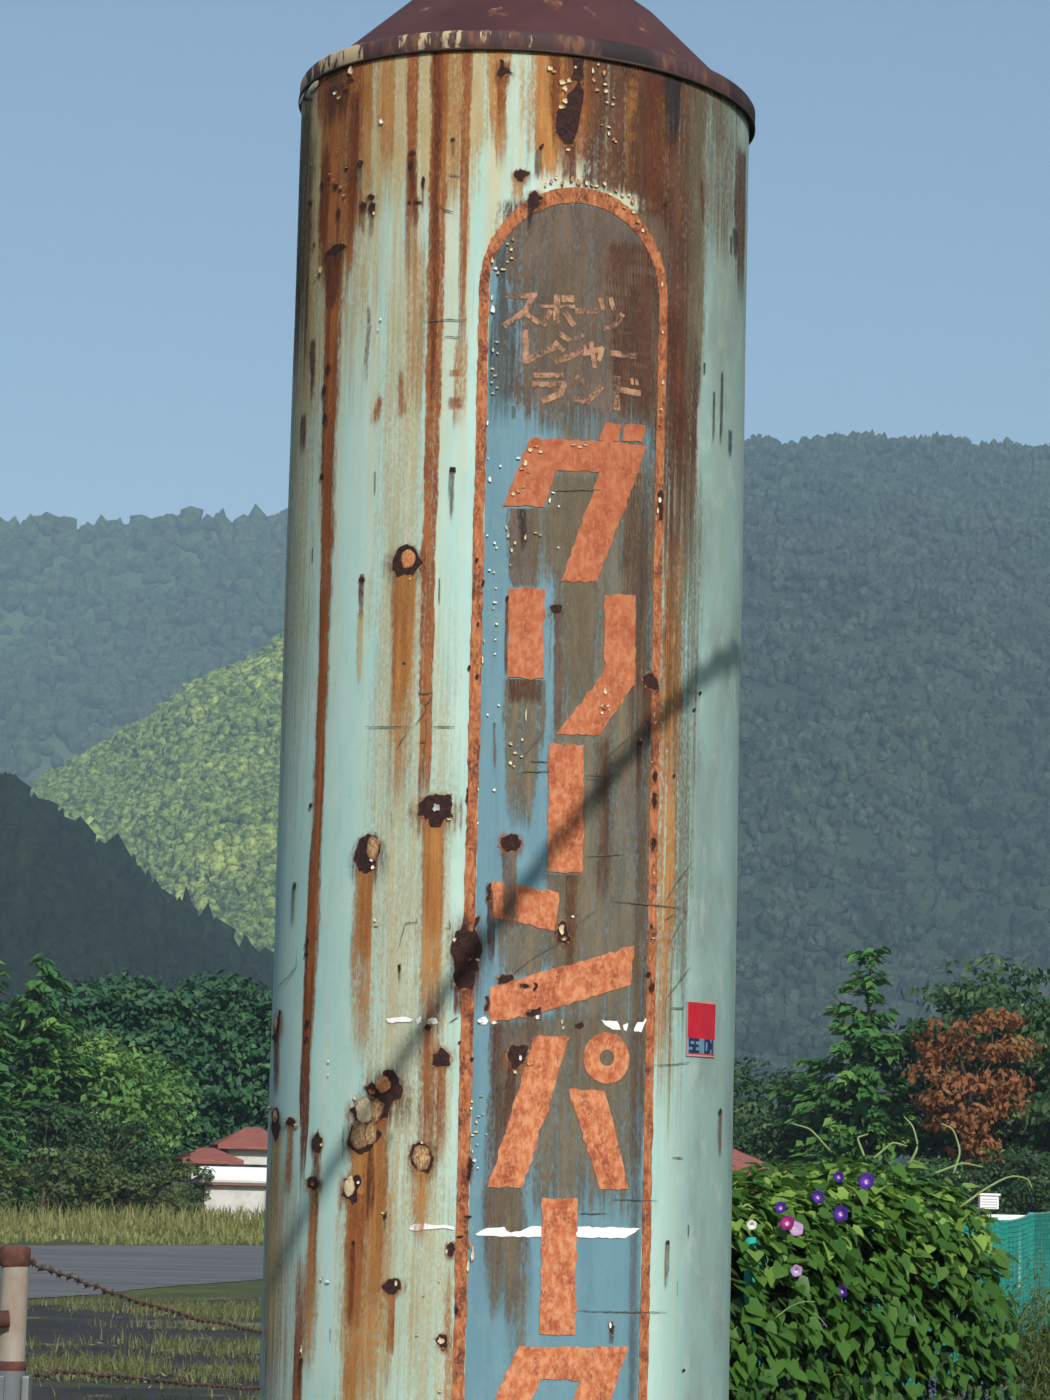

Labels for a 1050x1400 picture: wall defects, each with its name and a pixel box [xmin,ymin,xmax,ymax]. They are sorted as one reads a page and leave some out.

corrosion [294,50,511,1176]
corrosion [524,52,703,1070]
peeling [576,1226,641,1238]
corrosion [292,1267,305,1400]
corrosion [343,1346,357,1400]
corrosion [444,1283,452,1400]